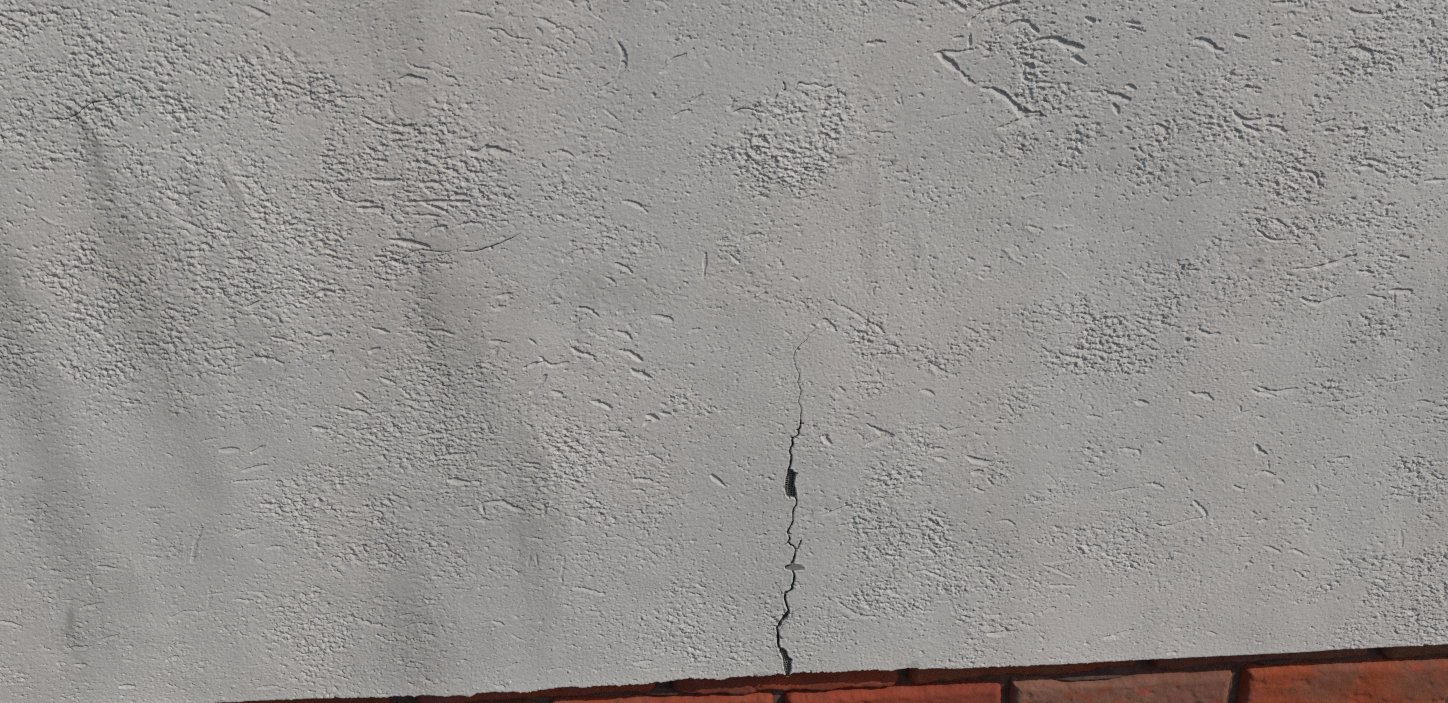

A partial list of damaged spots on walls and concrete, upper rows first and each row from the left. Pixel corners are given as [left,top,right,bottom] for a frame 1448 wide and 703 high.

crack [771,331,813,647]